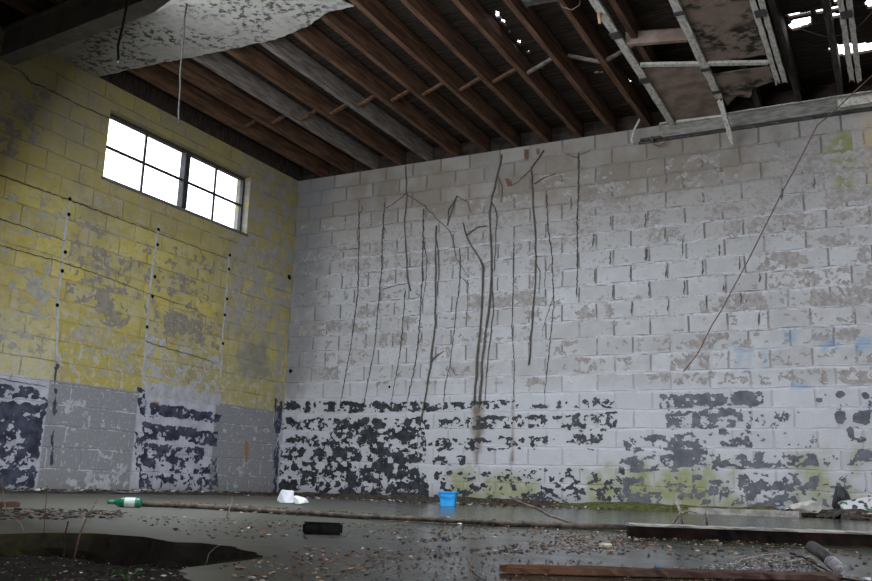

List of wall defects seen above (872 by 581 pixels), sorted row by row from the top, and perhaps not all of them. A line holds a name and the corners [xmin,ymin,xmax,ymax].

peeling [0,136,872,507]
water stain [228,120,864,410]